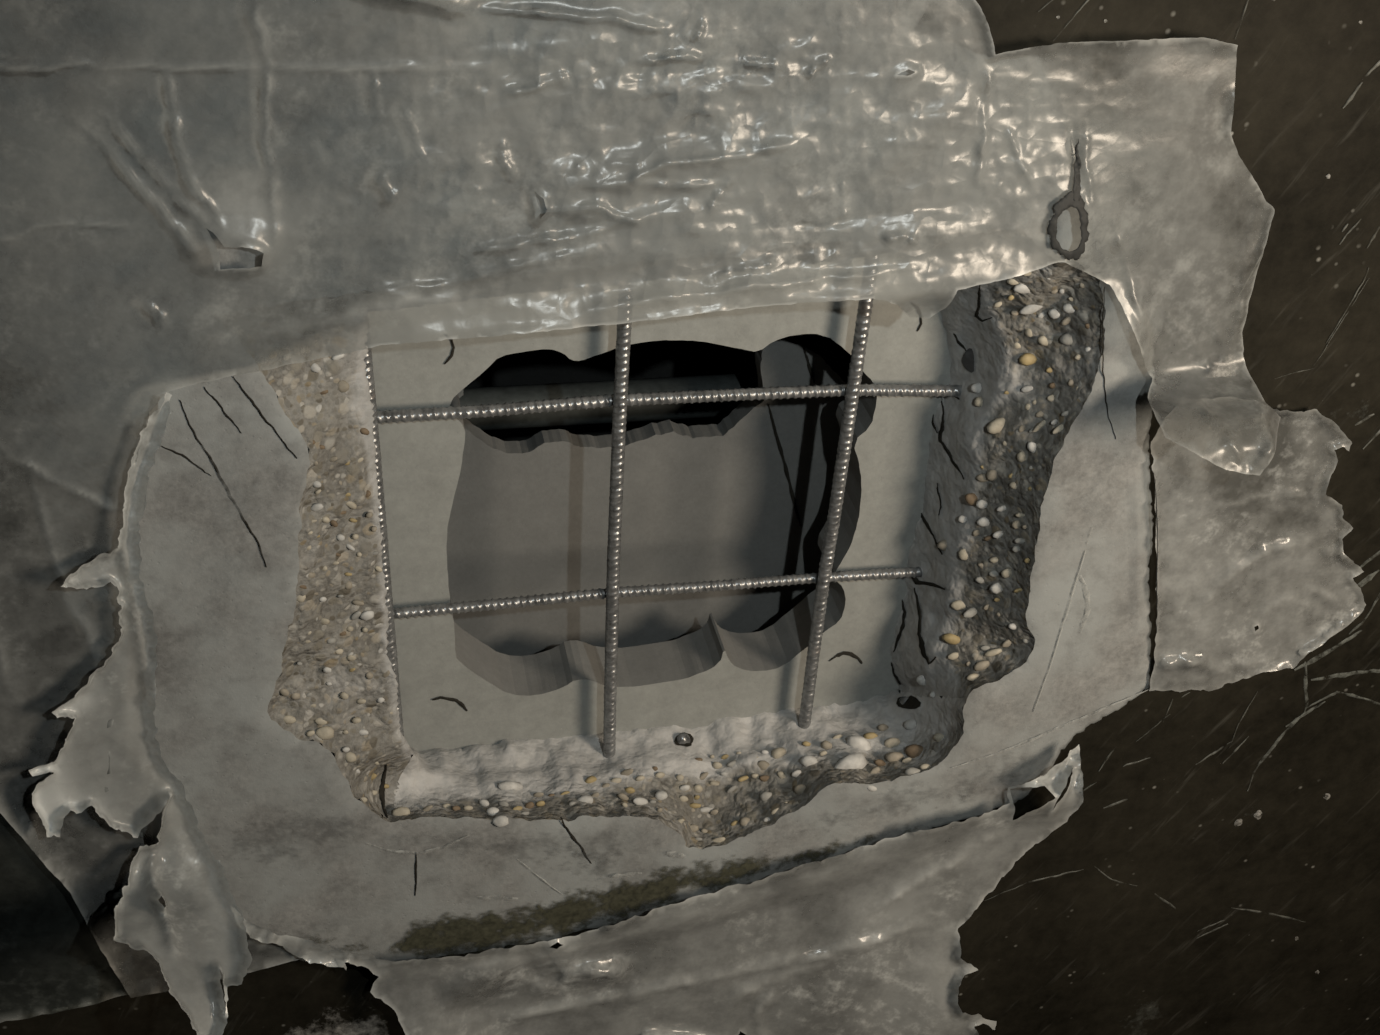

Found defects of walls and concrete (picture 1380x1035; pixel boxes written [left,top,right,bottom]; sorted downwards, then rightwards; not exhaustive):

crack [161,376,297,567]
peeling [0,0,1162,963]
damp [392,842,839,957]